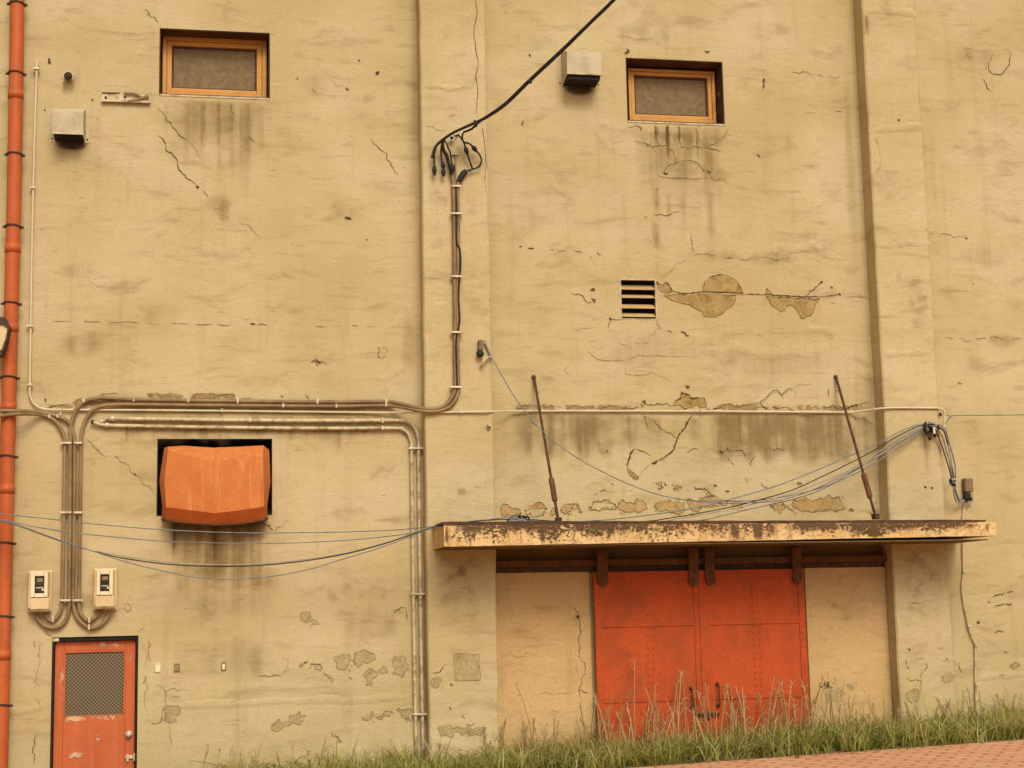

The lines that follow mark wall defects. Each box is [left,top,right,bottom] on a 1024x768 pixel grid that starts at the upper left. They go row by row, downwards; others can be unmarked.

crack [427,4,486,183]
crack [157,108,256,234]
crack [611,124,730,182]
spalling [656,273,744,318]
spalling [764,288,820,319]
crack [515,246,872,535]
spalling [672,385,780,410]
damp [720,414,842,457]
peeling [449,481,980,546]
damp [177,523,257,574]
peeling [299,649,409,686]
peeling [271,711,306,732]